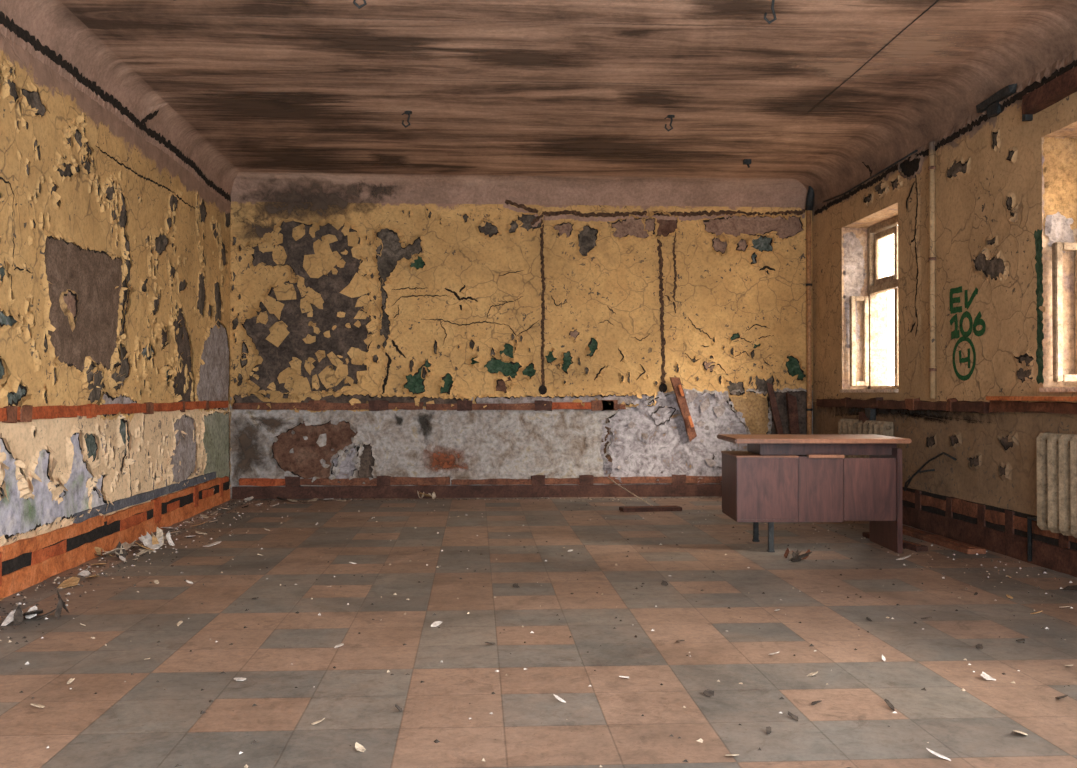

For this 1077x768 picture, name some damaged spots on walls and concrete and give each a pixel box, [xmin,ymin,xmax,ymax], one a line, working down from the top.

peeling [0,60,813,547]
crack [503,50,1077,382]